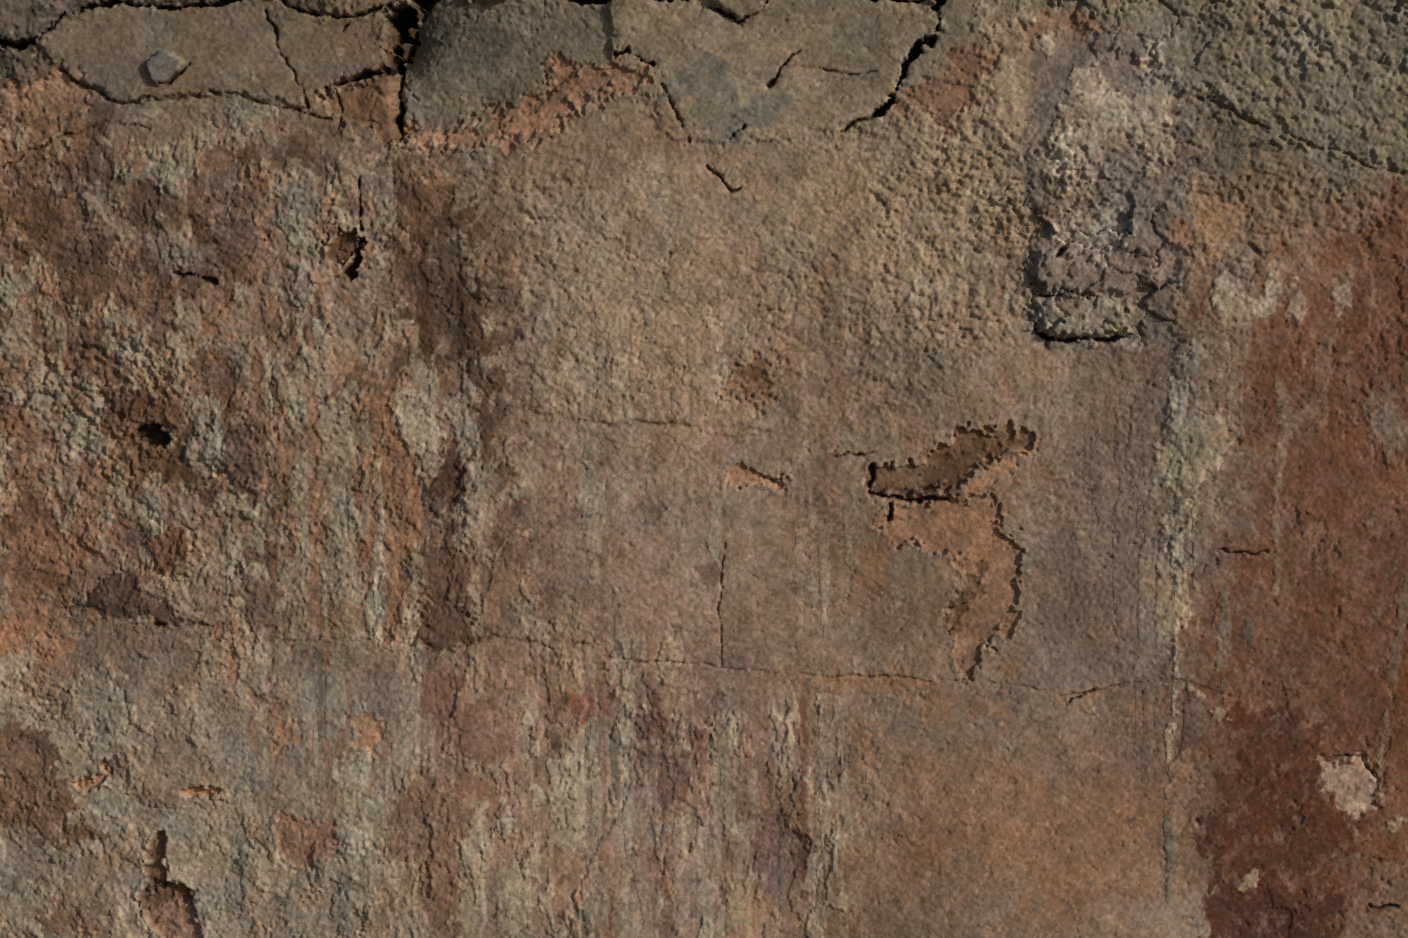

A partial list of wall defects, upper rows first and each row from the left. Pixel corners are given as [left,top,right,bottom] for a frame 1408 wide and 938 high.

crack [0,0,480,169]
crack [565,0,612,8]
crack [612,45,746,194]
crack [655,0,768,24]
crack [765,0,947,133]
crack [1190,95,1408,176]
damp [1360,373,1408,465]
flaking render [784,420,1046,709]
damp [1082,321,1391,938]
damp [1382,578,1408,685]